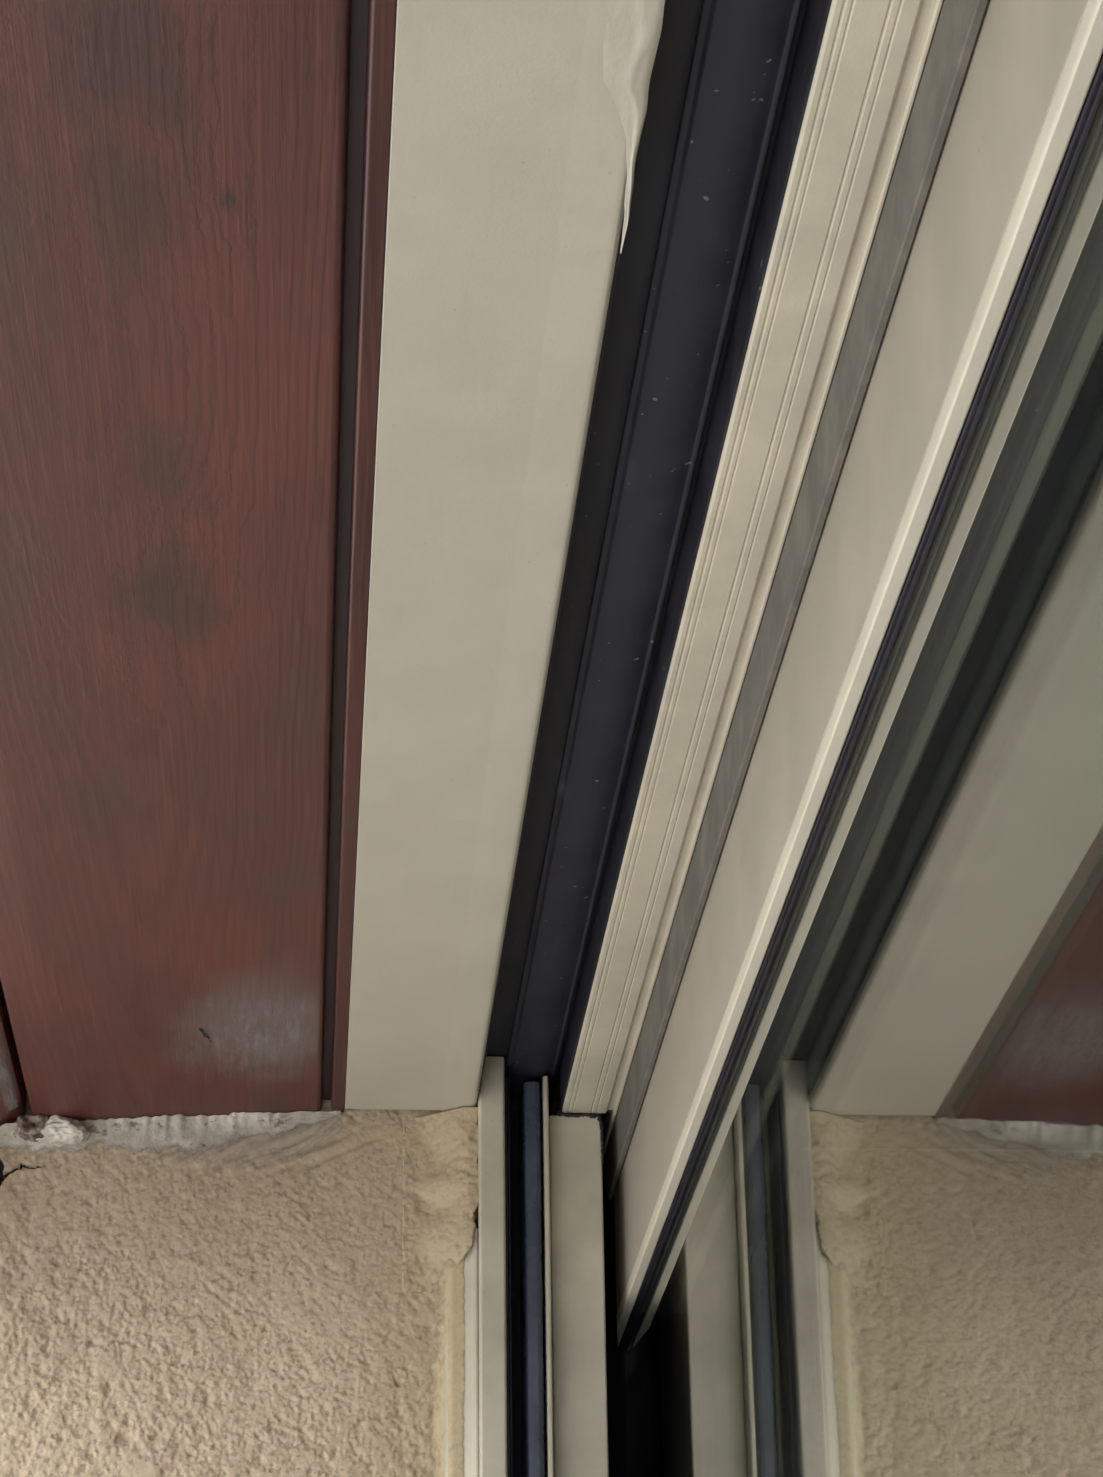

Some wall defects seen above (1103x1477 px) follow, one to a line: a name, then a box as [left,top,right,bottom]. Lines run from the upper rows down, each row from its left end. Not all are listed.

crack [0,1159,46,1186]